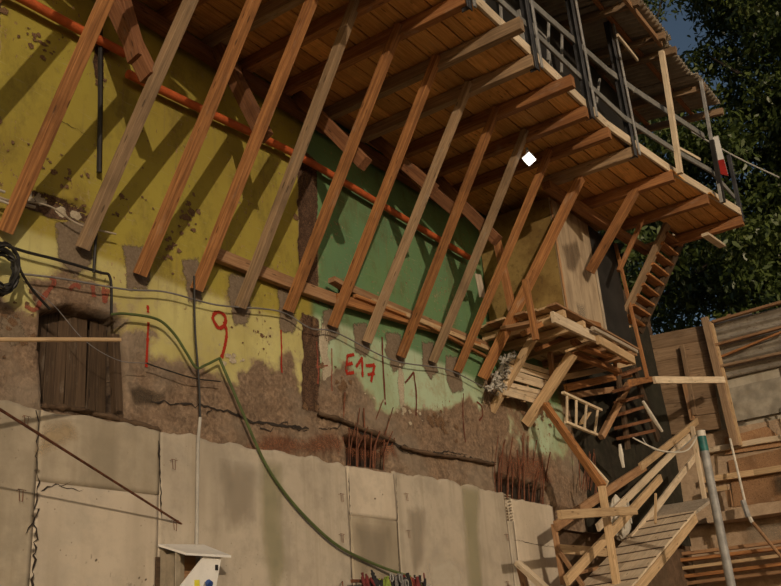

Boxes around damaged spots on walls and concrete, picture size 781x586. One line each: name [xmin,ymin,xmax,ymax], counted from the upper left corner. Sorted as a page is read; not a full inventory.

spalling [25,158,90,223]
flaking render [293,151,318,265]
flaking render [306,251,319,286]
flaking render [299,312,352,417]
crack [151,400,496,463]
spalling [342,393,459,470]
crack [25,410,84,586]
spalling [493,433,551,520]